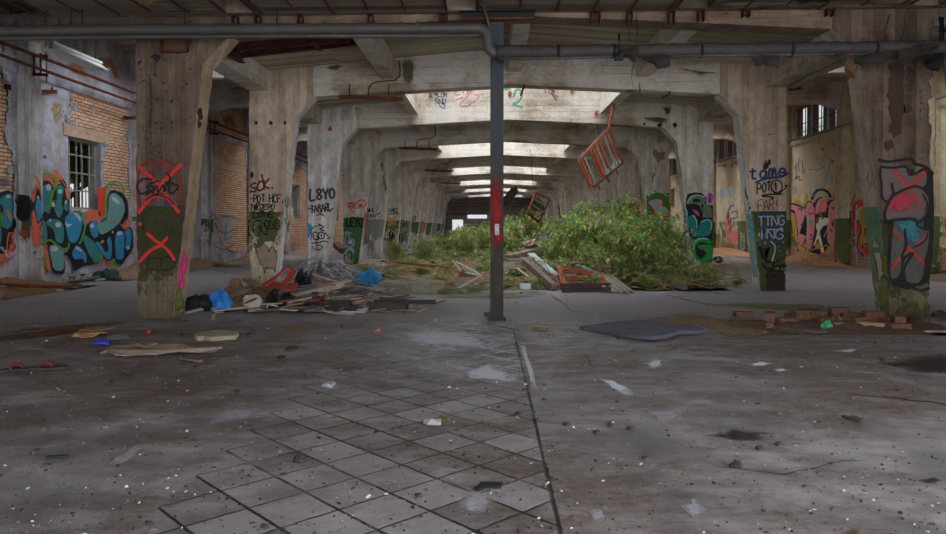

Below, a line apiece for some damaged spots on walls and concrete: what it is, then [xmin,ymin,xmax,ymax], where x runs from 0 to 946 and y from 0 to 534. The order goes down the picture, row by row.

flaking render [0,68,19,258]
flaking render [61,91,132,226]
flaking render [147,73,286,274]
peeling [883,62,917,151]
damp [883,355,946,373]
crack [718,459,868,474]